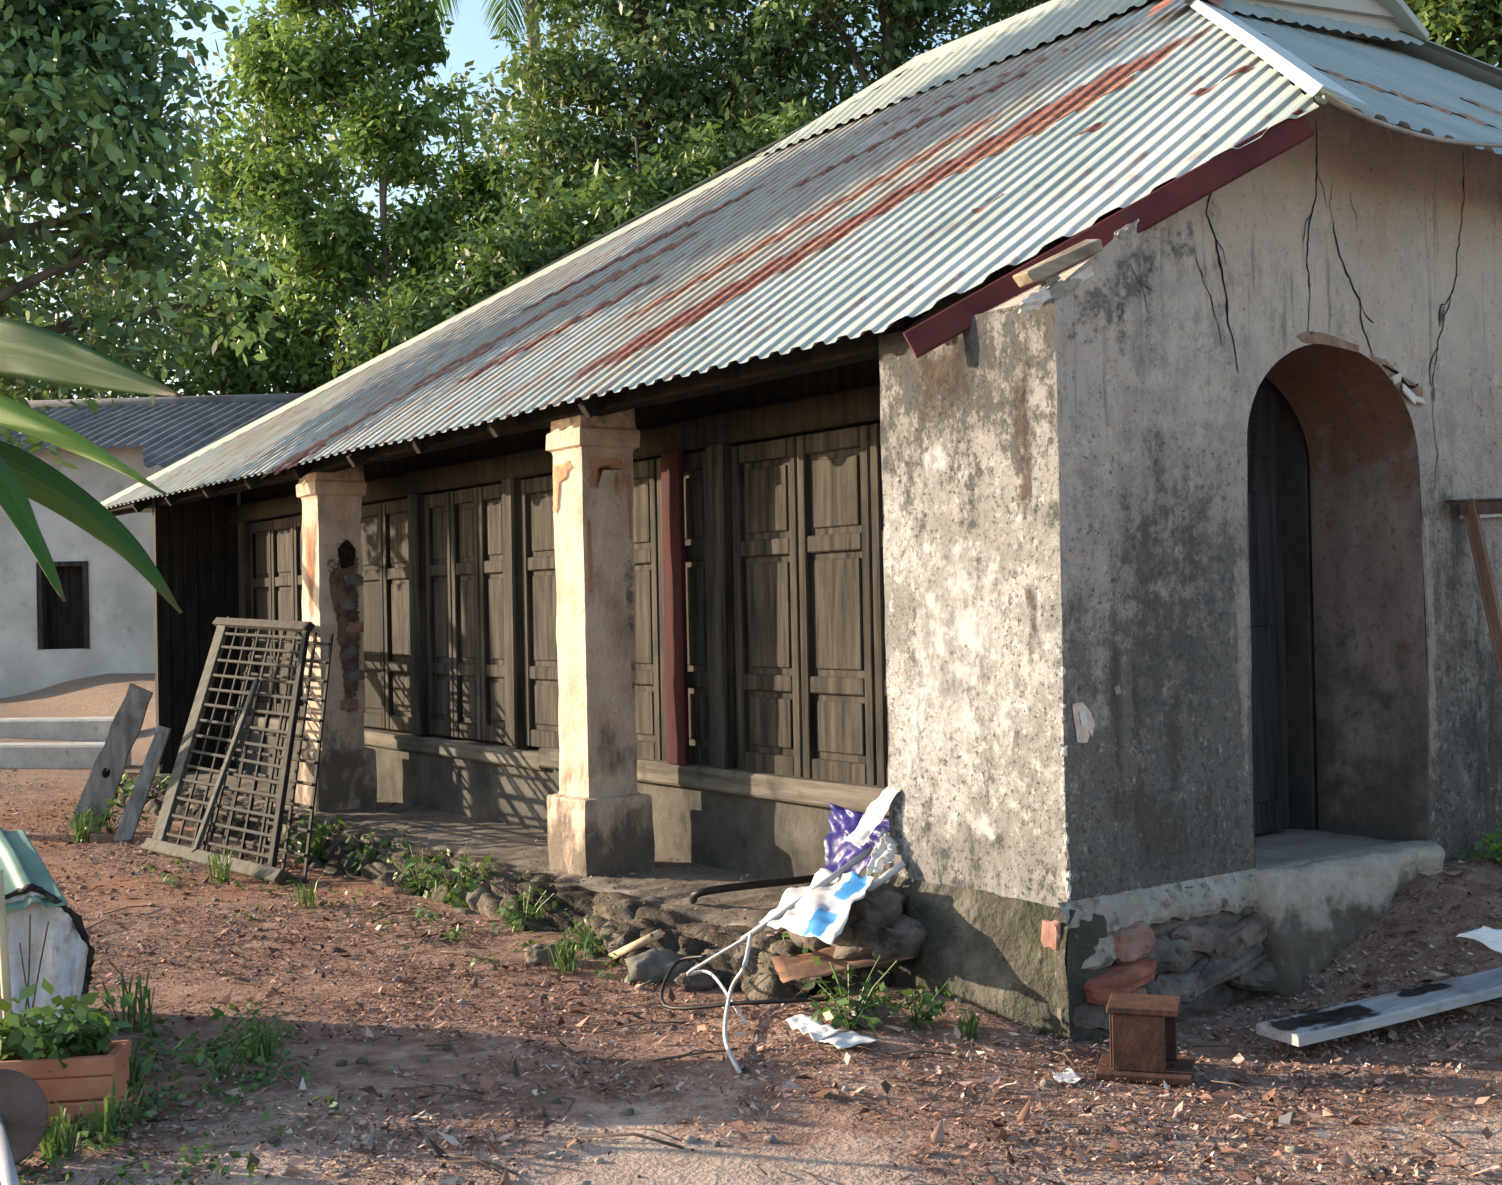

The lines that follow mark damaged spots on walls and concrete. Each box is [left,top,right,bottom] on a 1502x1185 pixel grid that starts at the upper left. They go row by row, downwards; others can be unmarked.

corrosion [1305,62,1502,131]
peeling [552,459,571,513]
corrosion [261,27,1212,479]
leakage [1012,371,1031,510]
crack [1194,193,1239,373]
crack [1302,120,1374,354]
spalling [1297,331,1426,406]
crack [1429,152,1465,484]
spalling [328,539,366,713]
leakage [908,544,996,767]
leakage [1025,588,1037,632]
spalling [1060,703,1095,793]